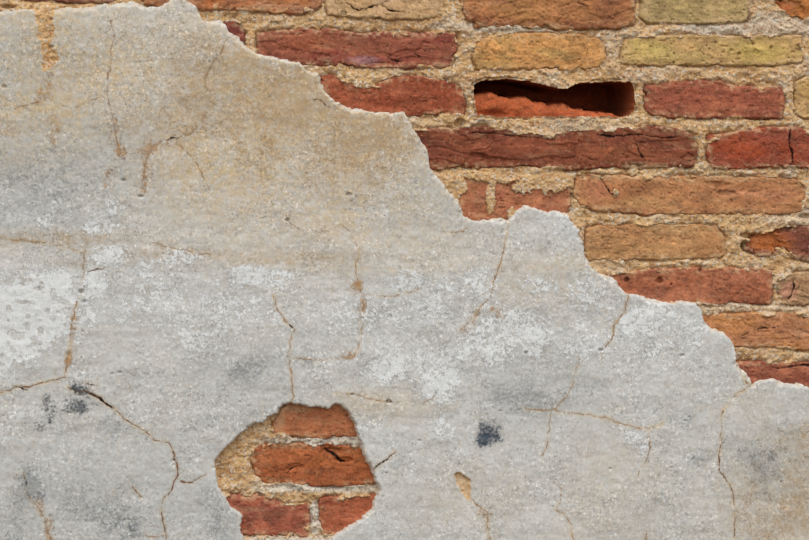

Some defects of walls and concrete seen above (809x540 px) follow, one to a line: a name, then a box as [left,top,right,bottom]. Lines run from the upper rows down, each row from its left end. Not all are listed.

spalling [775,0,809,20]
crack [273,296,362,403]
peeling [0,0,735,448]
crack [461,243,505,330]
crack [602,295,629,354]
spalling [741,229,791,257]
spalling [734,361,808,388]
crack [1,301,206,537]
spalling [214,402,382,540]
crack [323,445,349,462]
leakage [476,420,501,448]
crack [528,366,651,474]